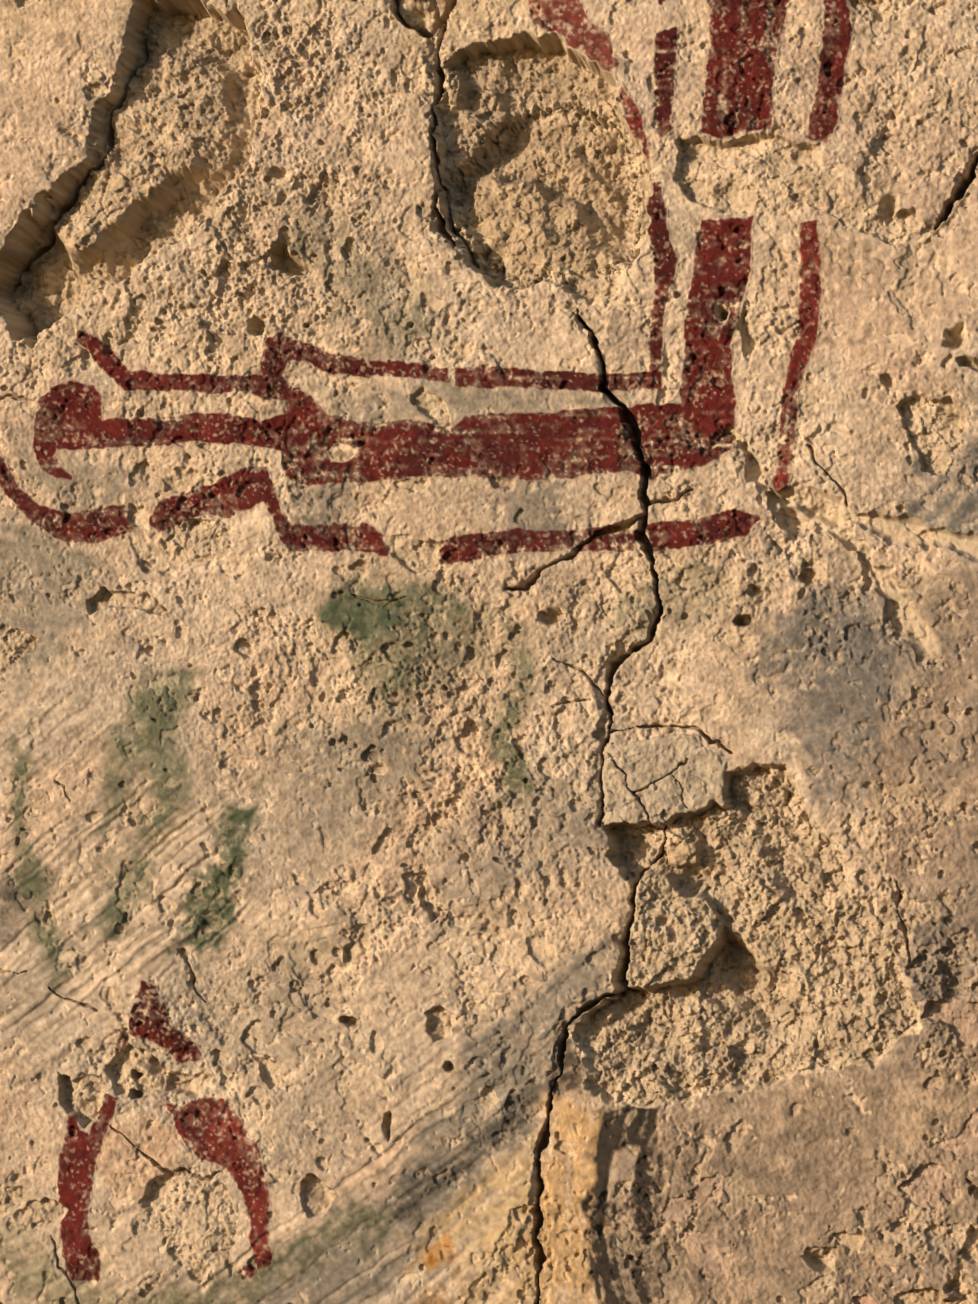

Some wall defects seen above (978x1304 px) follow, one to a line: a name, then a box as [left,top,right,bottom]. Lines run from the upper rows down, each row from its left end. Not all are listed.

spalling [0,0,266,351]
crack [392,0,458,248]
spalling [433,30,654,307]
peeling [672,132,927,246]
crack [352,594,415,605]
crack [506,308,734,829]
crack [532,823,669,1304]
spalling [569,762,978,1111]
peeling [0,1184,65,1233]